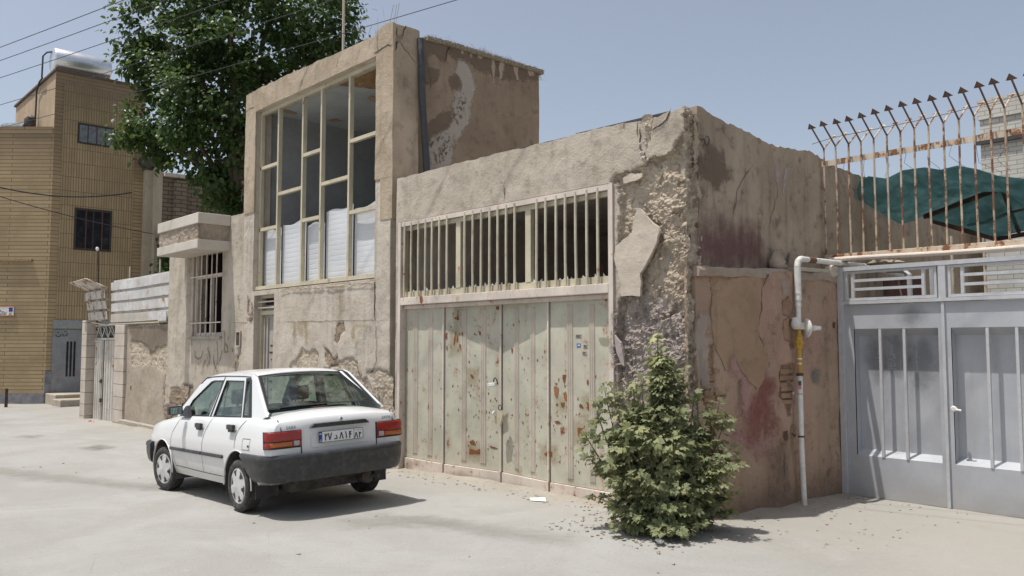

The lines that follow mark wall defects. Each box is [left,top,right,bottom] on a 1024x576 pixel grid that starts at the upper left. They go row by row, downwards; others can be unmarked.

damp [700,145,730,195]
flaking render [608,108,728,431]
damp [697,220,762,268]
flaking render [131,340,189,419]
flaking render [285,323,395,414]
corrosion [445,310,498,456]
corrosion [511,375,599,474]
flaking render [779,363,794,415]